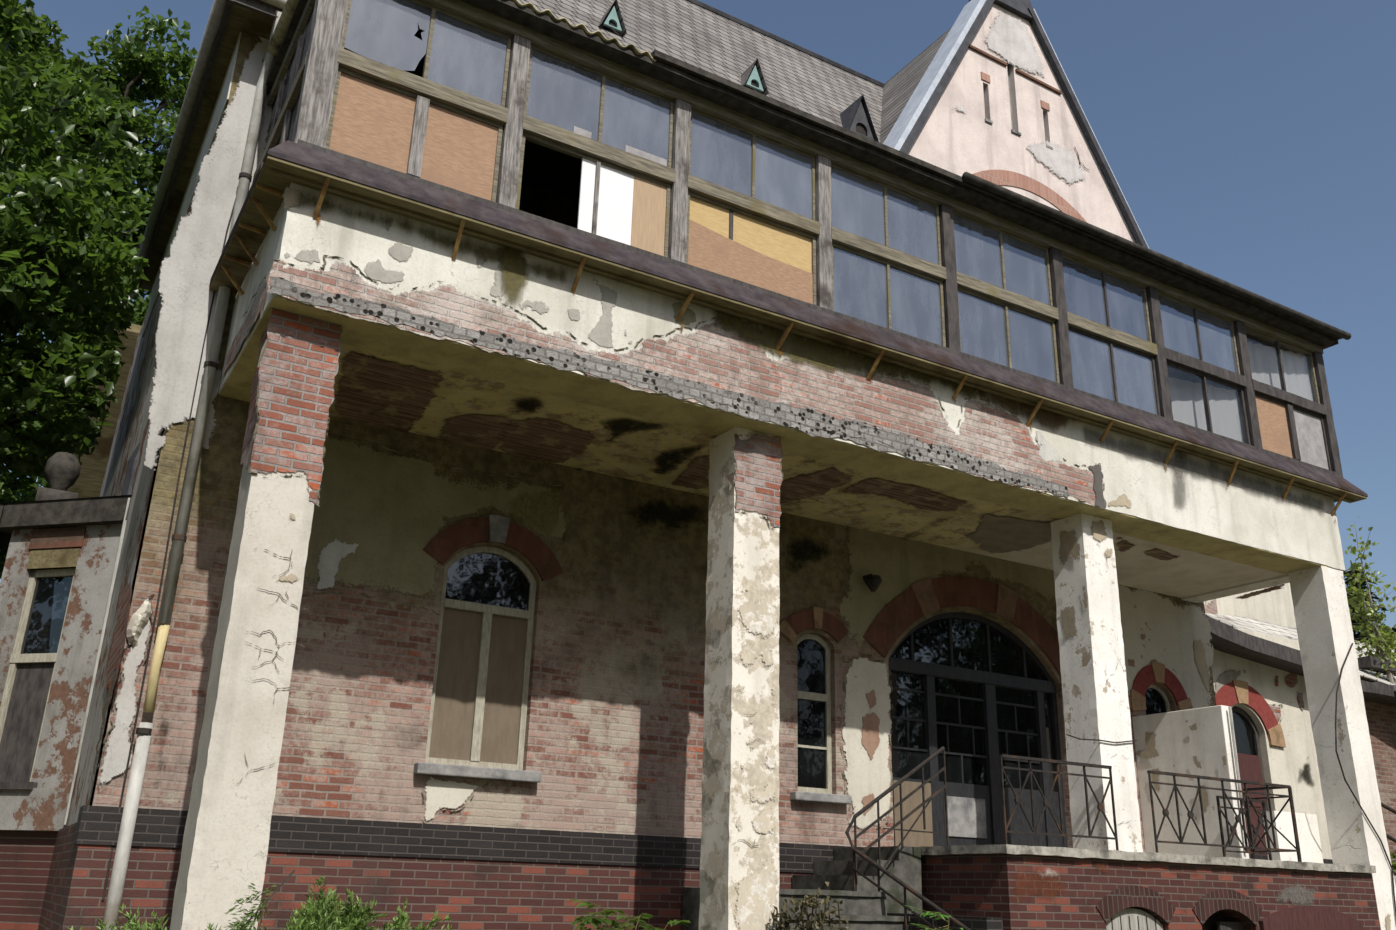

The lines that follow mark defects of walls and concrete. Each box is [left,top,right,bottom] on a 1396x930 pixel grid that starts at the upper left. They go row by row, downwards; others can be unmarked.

damp [653,444,705,475]
damp [630,501,705,529]
flaking render [240,222,1180,834]
crack [247,548,314,703]
peeling [734,856,779,930]